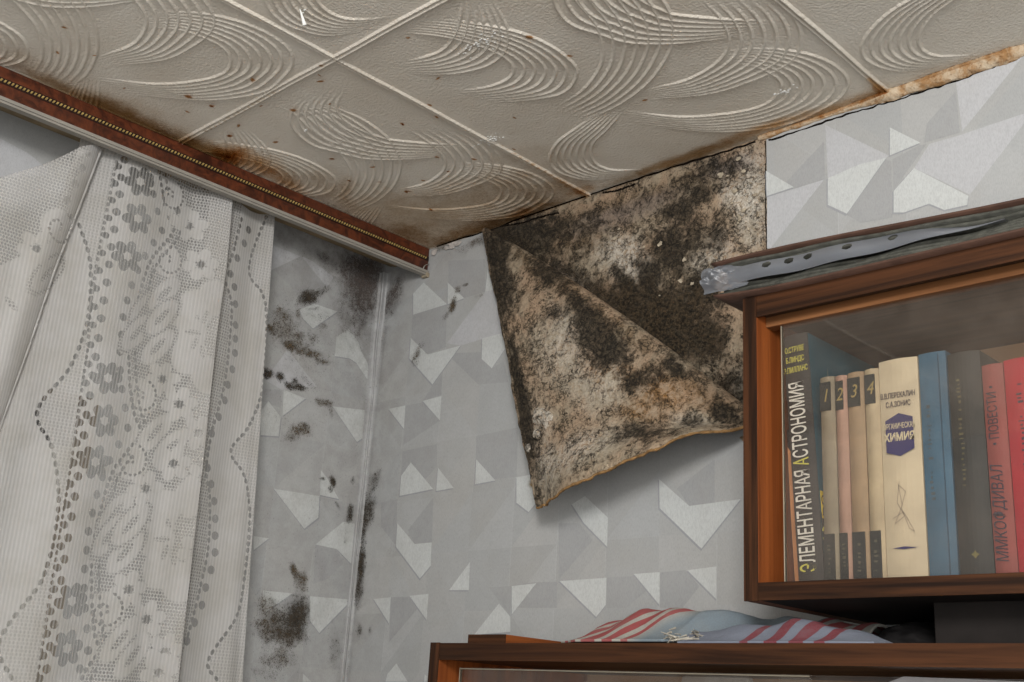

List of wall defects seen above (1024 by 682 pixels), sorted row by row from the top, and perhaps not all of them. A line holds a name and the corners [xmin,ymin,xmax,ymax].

water stain [60,89,230,163]
water stain [267,286,328,368]
water stain [339,255,401,330]
flaking render [492,139,767,403]
water stain [263,368,333,417]
water stain [322,470,380,606]
water stain [254,563,311,678]